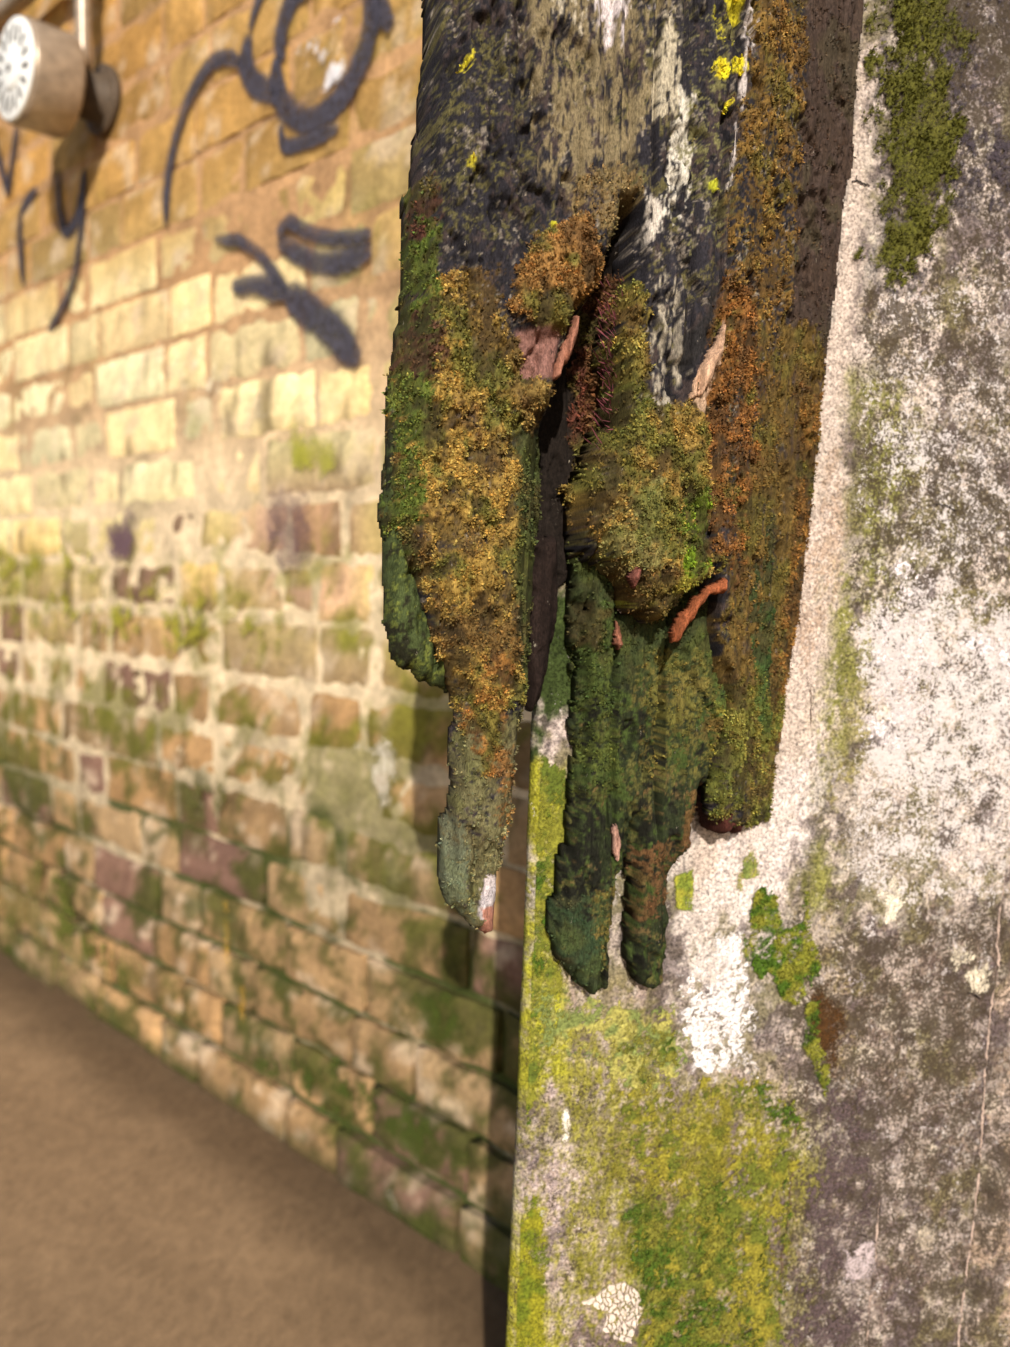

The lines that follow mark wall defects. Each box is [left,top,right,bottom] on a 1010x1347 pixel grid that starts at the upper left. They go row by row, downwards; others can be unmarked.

water stain [0,506,285,666]
water stain [143,755,228,854]
water stain [367,741,396,803]
water stain [0,839,159,1018]
water stain [208,1048,479,1206]
water stain [526,753,885,1347]
water stain [516,1195,550,1347]